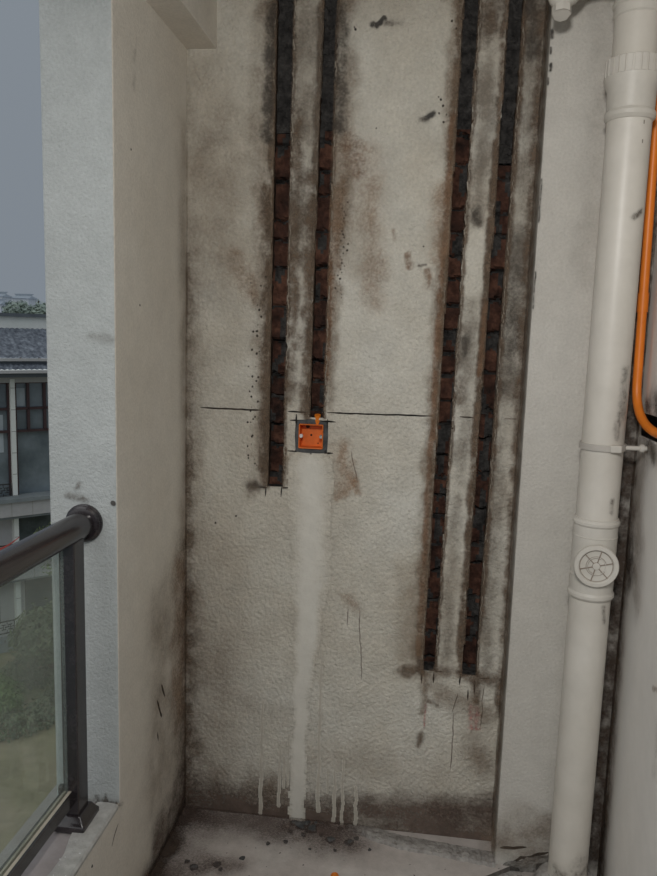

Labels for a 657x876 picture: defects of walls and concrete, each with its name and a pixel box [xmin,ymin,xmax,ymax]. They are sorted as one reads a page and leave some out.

leakage [144,649,498,876]